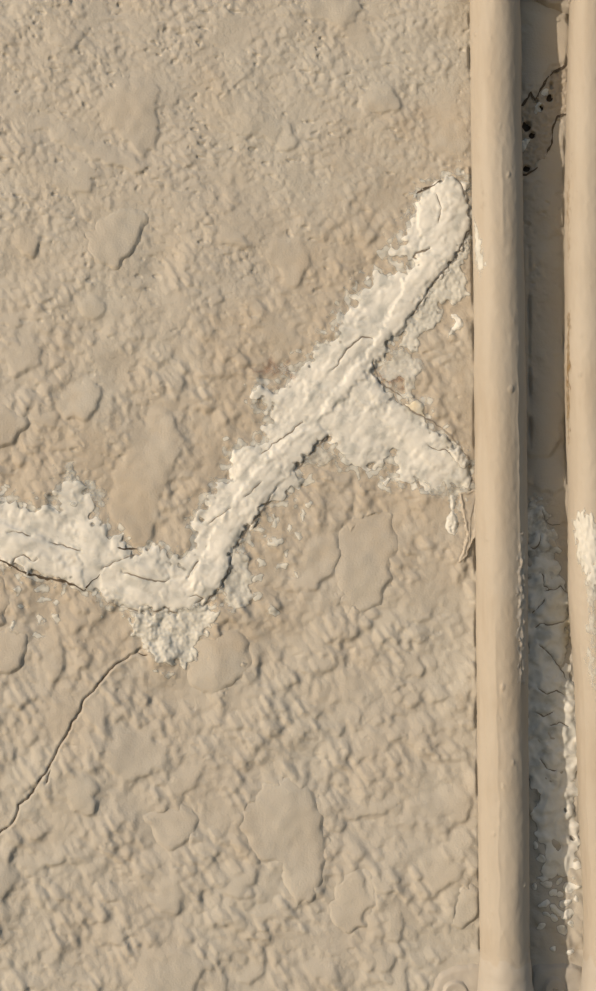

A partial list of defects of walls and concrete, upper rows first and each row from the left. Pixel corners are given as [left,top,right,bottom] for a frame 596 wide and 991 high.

peeling [521,65,567,176]
crack [416,179,465,221]
crack [411,225,471,316]
crack [261,422,303,454]
crack [295,436,328,471]
crack [332,336,471,466]
crack [0,482,276,614]
crack [0,649,147,833]